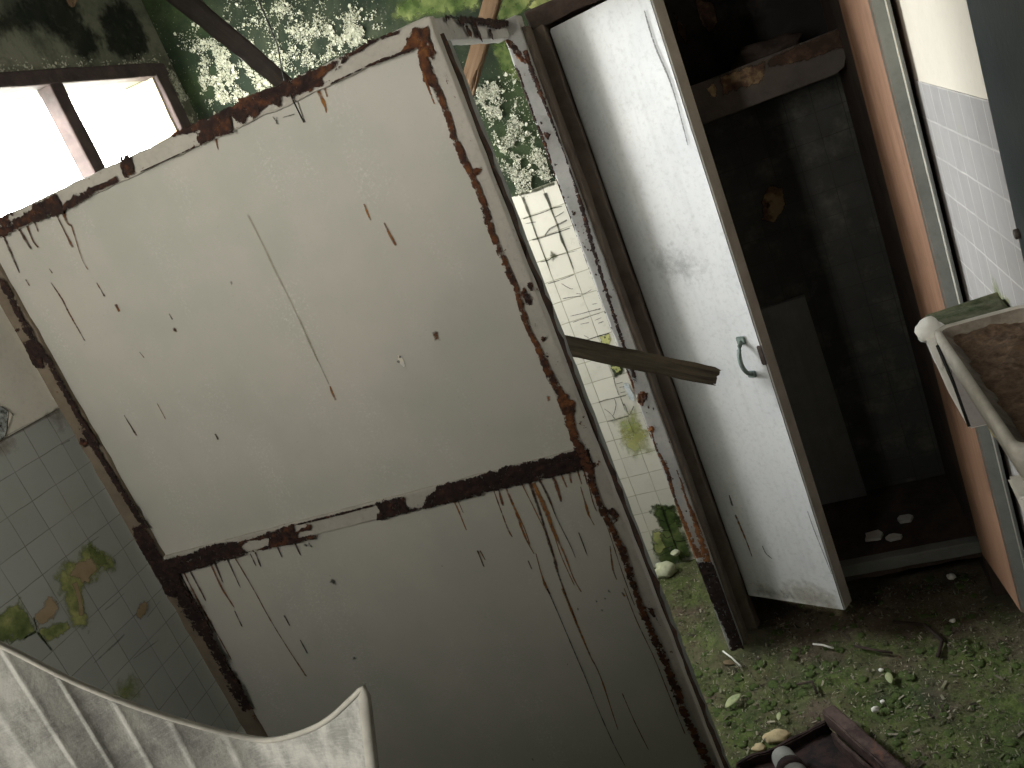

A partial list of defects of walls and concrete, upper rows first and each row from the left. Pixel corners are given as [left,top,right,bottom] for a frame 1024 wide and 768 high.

peeling [0,22,273,125]
peeling [223,0,386,78]
crack [526,212,567,235]
crack [548,275,609,340]
rust [0,14,715,768]
crack [599,379,634,430]
rust [626,369,744,652]